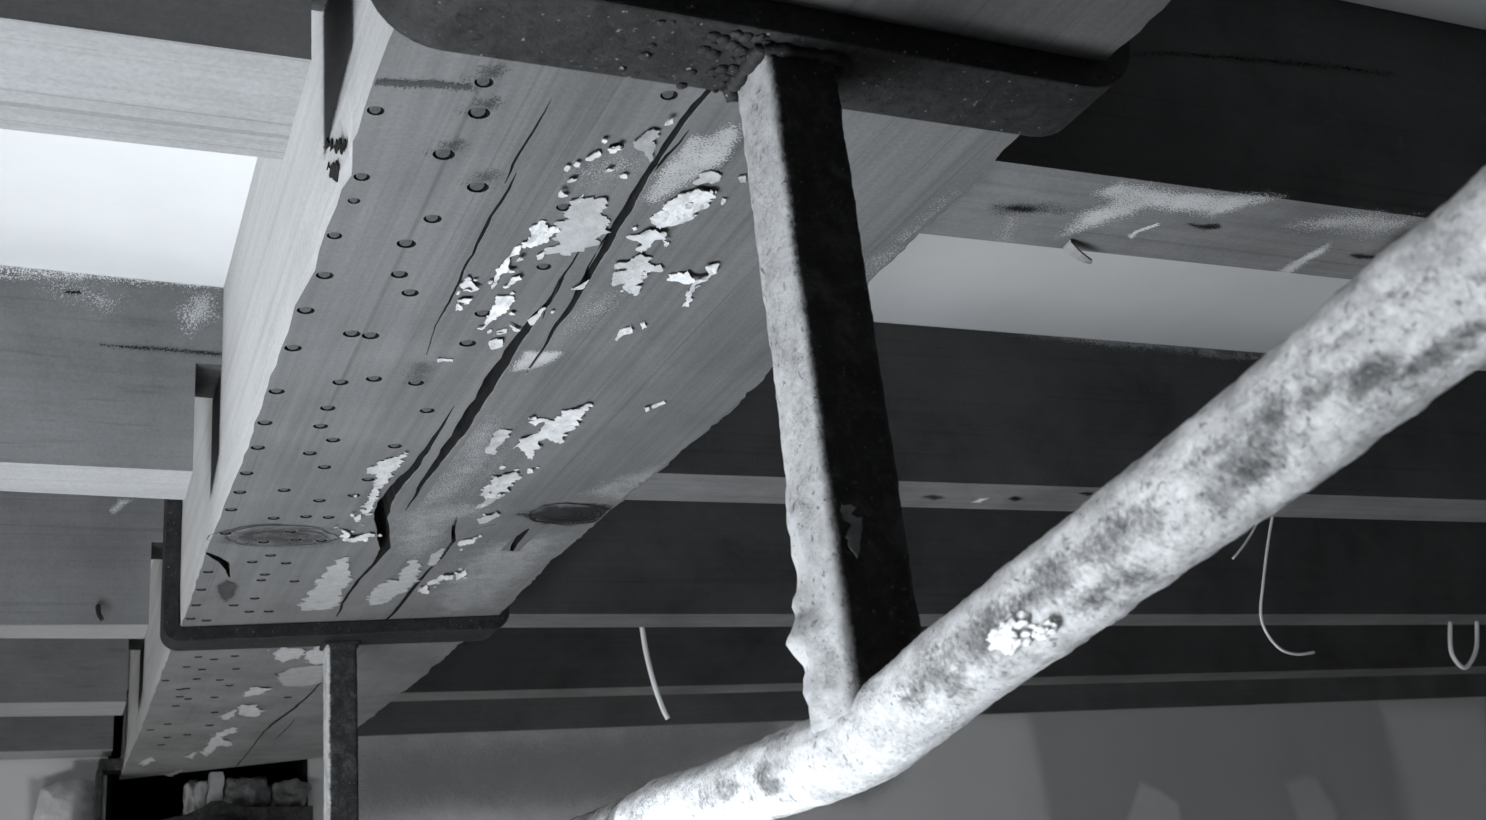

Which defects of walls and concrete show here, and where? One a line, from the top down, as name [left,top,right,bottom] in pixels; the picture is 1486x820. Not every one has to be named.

peeling [455,118,746,350]
crack [336,89,712,620]
peeling [297,452,409,611]
peeling [365,403,593,605]
spalling [105,646,323,820]
crack [236,683,321,767]